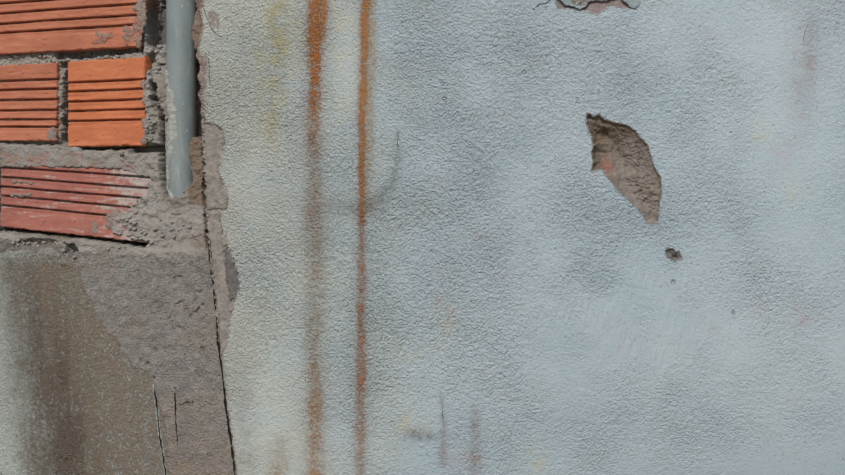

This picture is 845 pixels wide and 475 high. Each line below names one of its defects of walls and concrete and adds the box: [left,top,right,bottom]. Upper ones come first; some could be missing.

peeling [555,0,640,16]
rust [307,0,327,137]
spalling [585,113,663,225]
rust [357,0,373,454]
spalling [665,247,683,262]
leakage [9,254,169,475]
crack [207,238,237,475]
crack [151,377,192,475]
rust [309,390,322,475]